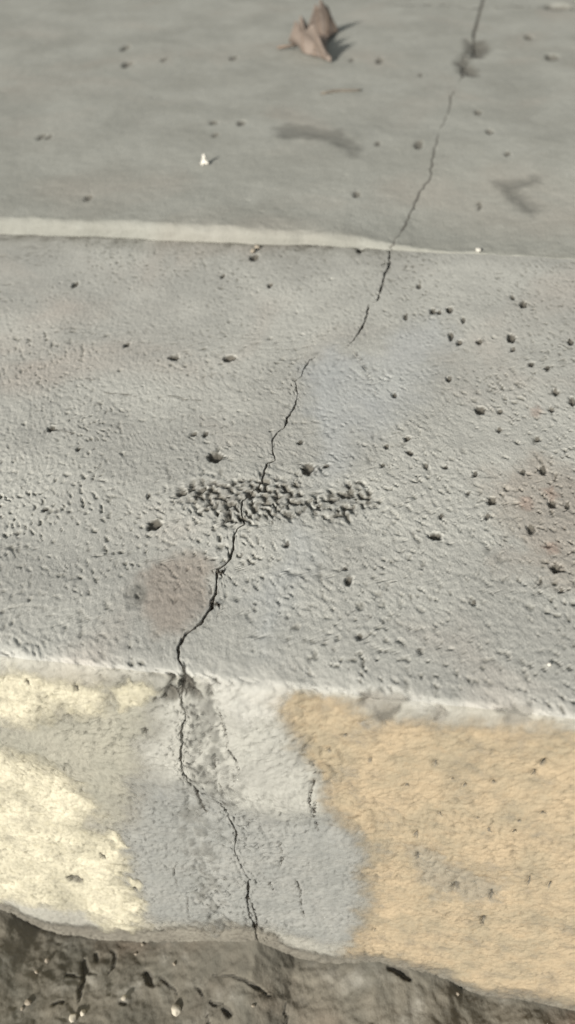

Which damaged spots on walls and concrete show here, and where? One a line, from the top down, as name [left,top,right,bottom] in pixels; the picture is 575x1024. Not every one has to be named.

crack [347,0,541,369]
crack [178,360,310,673]
crack [180,710,239,817]
crack [247,844,304,936]